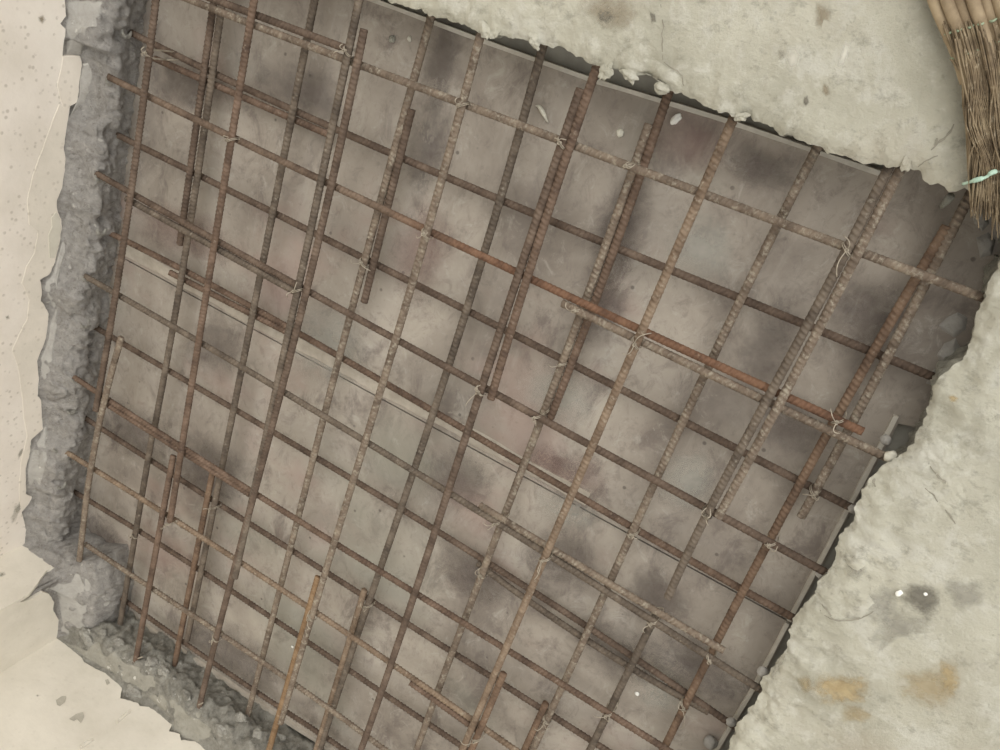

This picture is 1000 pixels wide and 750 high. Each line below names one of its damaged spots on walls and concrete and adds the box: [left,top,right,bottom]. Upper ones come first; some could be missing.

spalling [12,0,464,750]
spalling [220,14,600,681]
spalling [358,91,1000,750]
water stain [907,587,937,613]